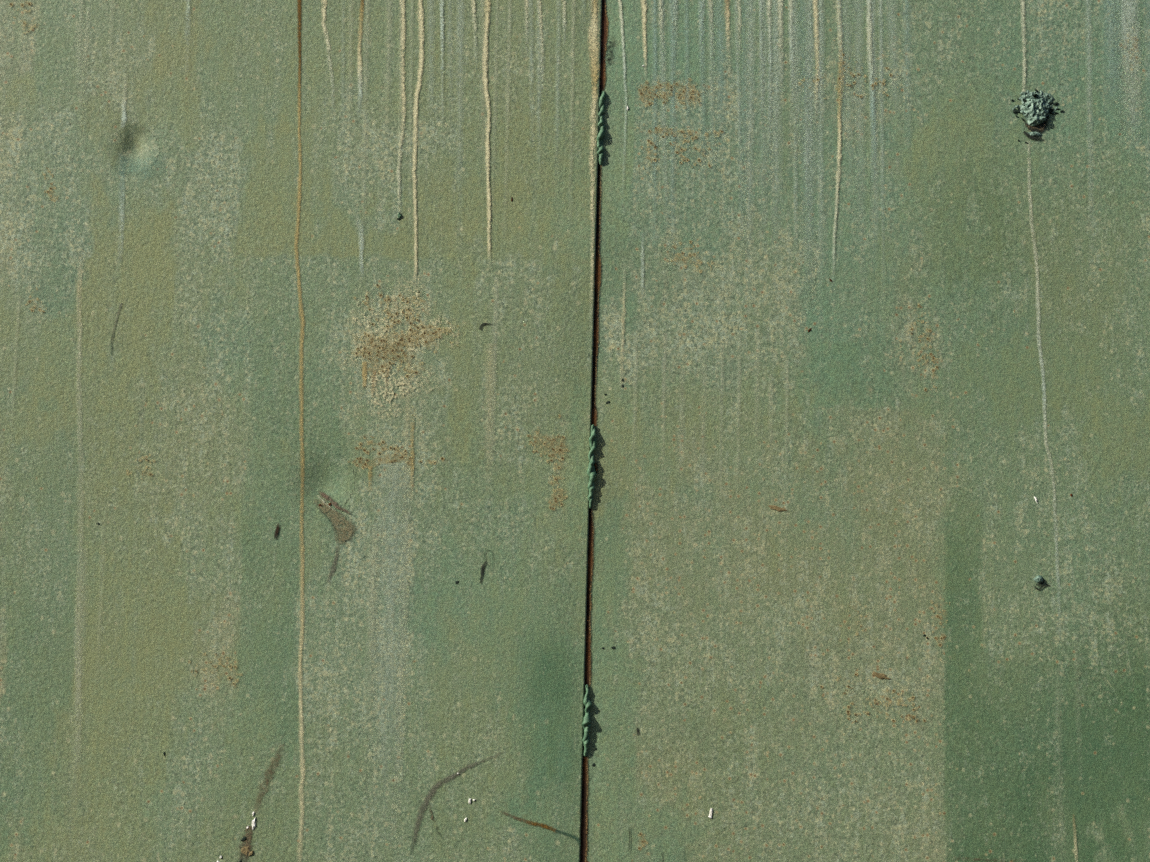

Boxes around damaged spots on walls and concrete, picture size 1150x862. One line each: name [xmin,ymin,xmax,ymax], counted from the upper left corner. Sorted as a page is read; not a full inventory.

leakage [344,0,453,415]
rust [351,284,459,391]
leakage [471,0,491,258]
rust [592,165,601,426]
rust [600,0,608,91]
leakage [641,0,677,107]
leakage [699,0,822,112]
leakage [833,0,843,256]
leakage [866,0,882,129]
leakage [1027,144,1057,556]
rust [585,509,594,686]